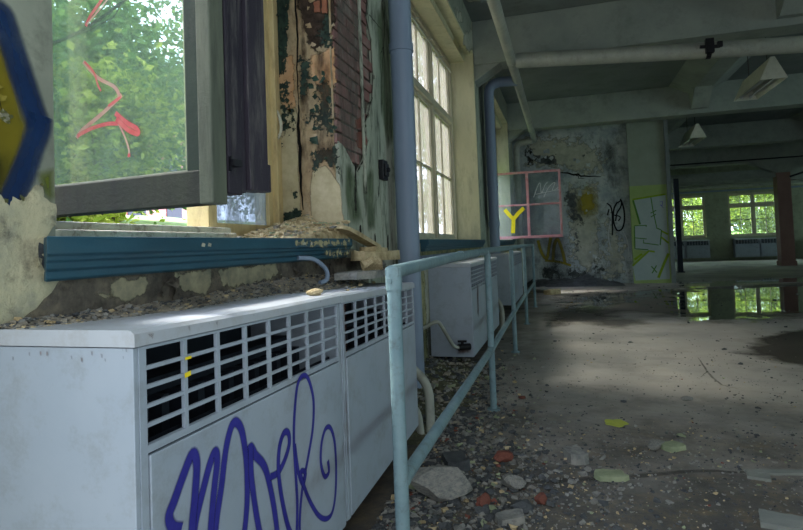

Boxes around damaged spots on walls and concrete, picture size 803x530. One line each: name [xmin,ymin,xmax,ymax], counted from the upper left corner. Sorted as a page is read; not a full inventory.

flaking render [276,0,375,176]
spalling [0,183,369,324]